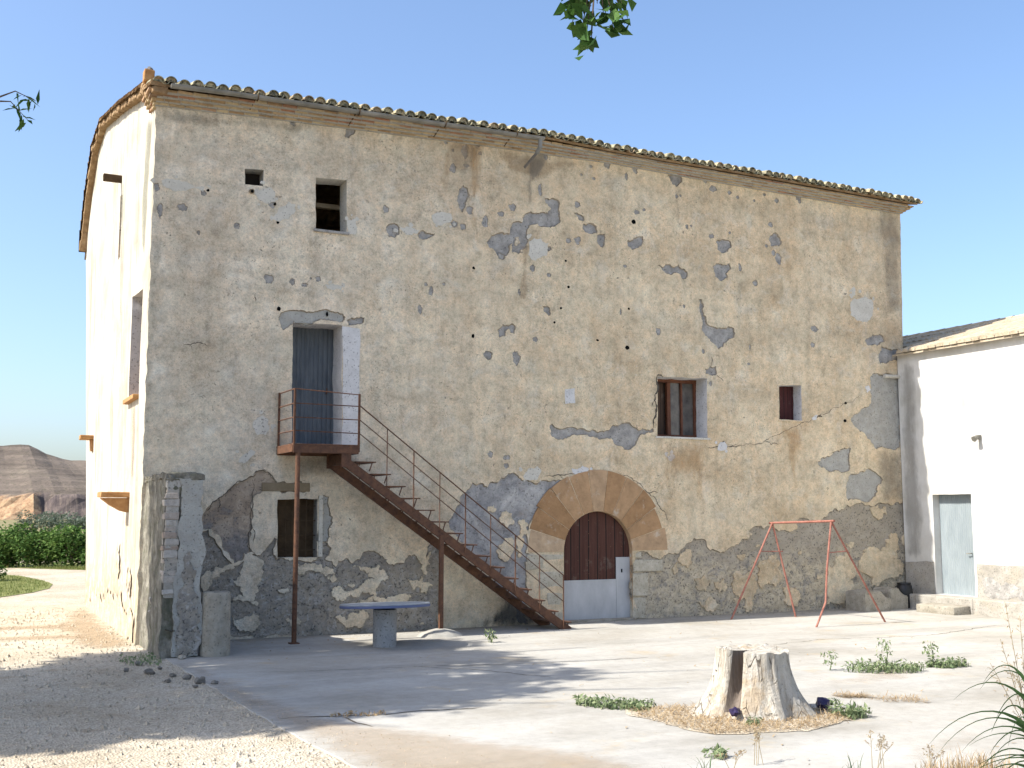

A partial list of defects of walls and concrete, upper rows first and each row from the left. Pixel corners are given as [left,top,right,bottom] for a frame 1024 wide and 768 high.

spalling [451,184,560,259]
spalling [277,306,363,329]
spalling [699,300,734,354]
spalling [550,423,652,449]
crack [652,374,663,428]
crack [709,395,860,449]
spalling [843,335,900,450]
spalling [175,471,439,657]
spalling [449,451,560,604]
spalling [605,448,906,632]